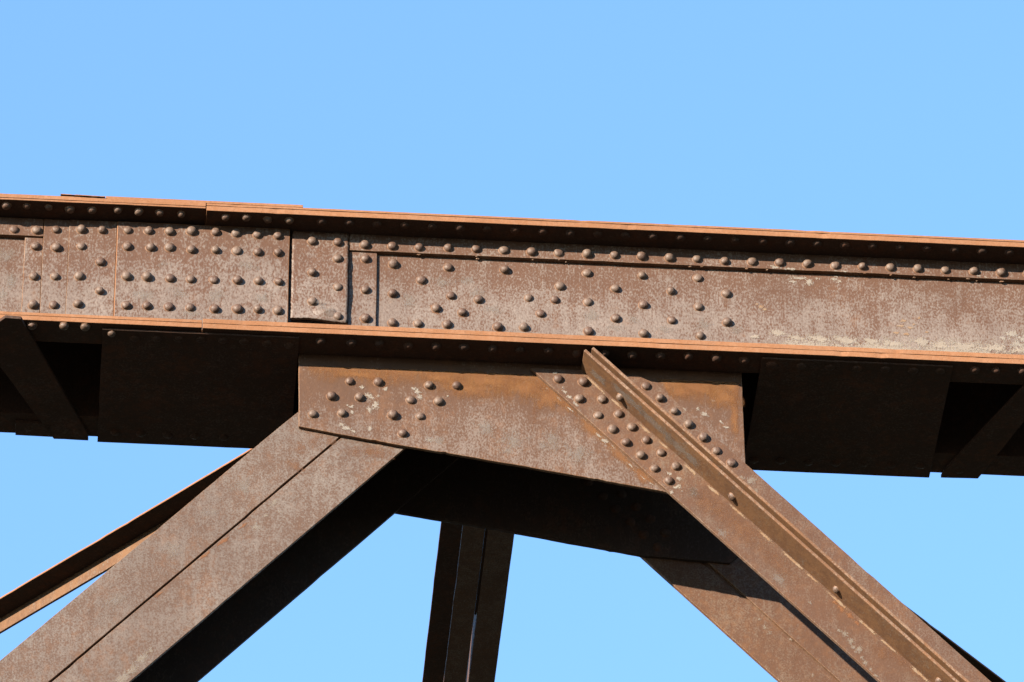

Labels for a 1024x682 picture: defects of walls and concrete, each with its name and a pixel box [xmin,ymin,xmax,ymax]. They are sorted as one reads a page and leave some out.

rust [309,366,573,409]
rust [659,379,739,432]
rust [829,593,896,652]